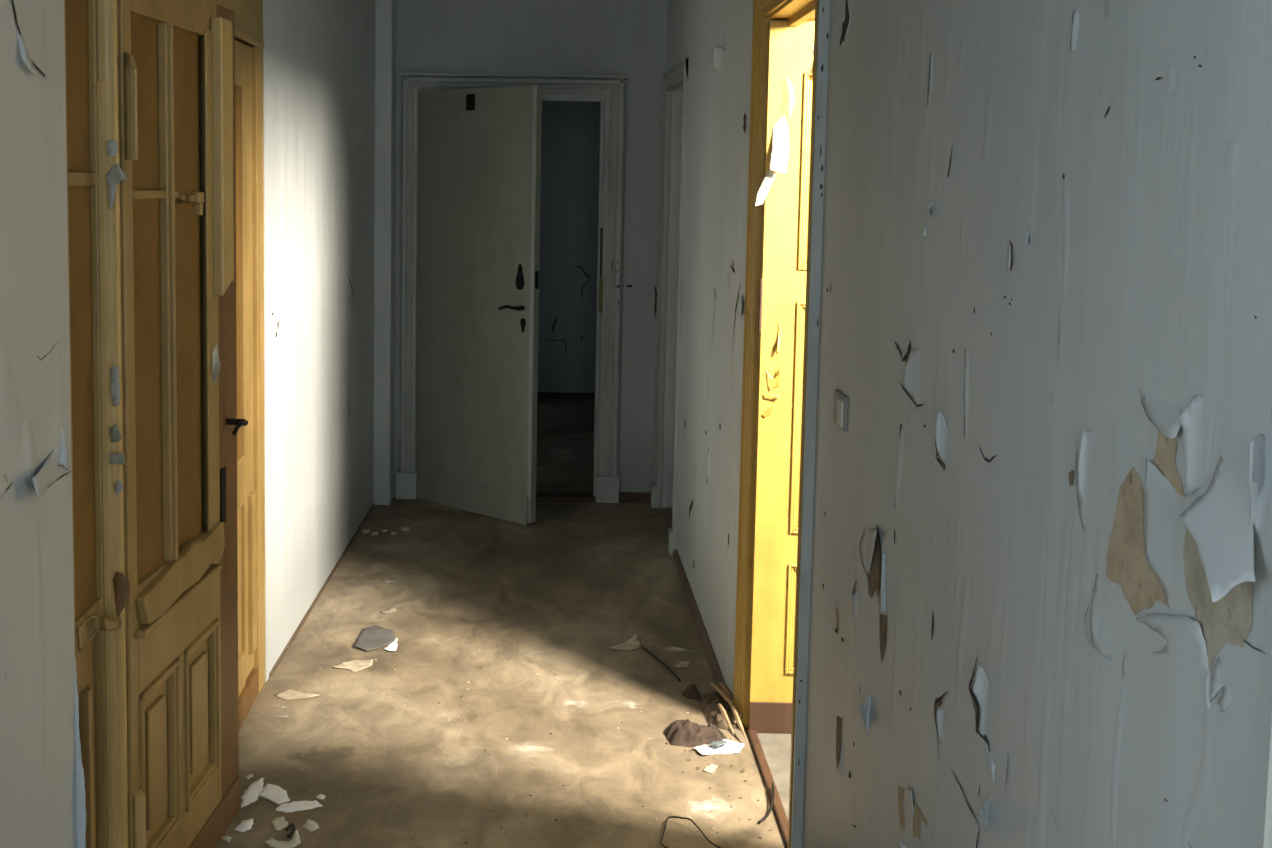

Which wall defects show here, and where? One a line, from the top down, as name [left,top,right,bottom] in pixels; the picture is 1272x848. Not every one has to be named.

crack [840,0,852,46]
peeling [755,116,789,206]
peeling [894,341,924,407]
peeling [32,420,71,498]
peeling [924,410,948,471]
peeling [1069,430,1092,531]
peeling [834,523,887,663]
peeling [1085,386,1266,712]
peeling [836,688,870,778]
peeling [934,690,948,758]
peeling [951,658,996,832]